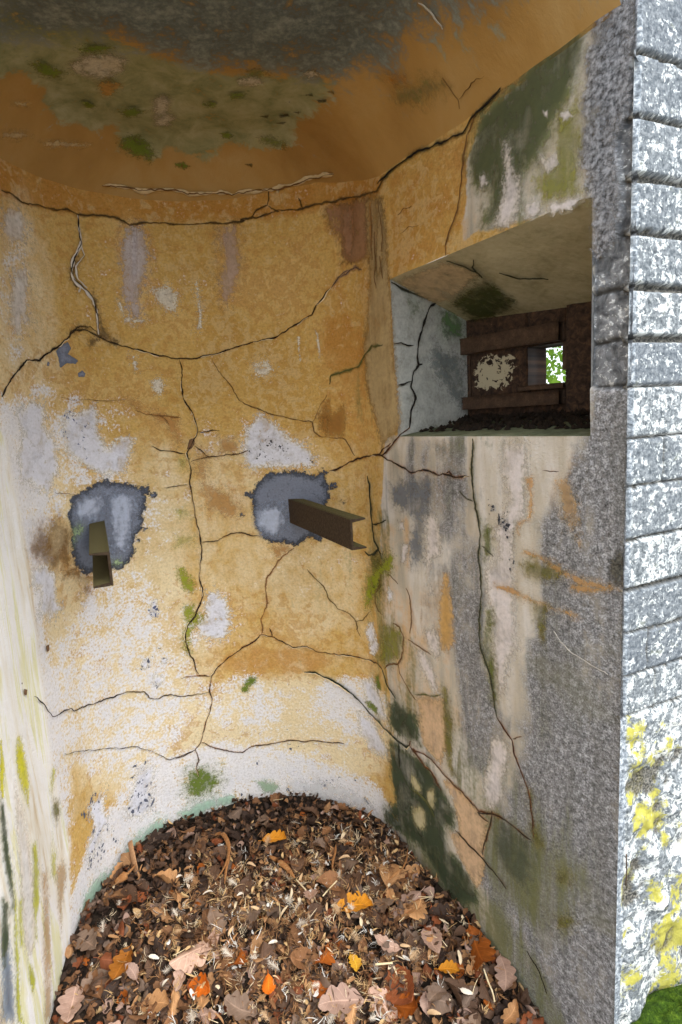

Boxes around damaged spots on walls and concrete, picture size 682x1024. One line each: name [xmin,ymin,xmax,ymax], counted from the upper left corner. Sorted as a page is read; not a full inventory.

peeling [47,342,85,377]
crack [2,76,548,889]
water stain [387,699,421,748]